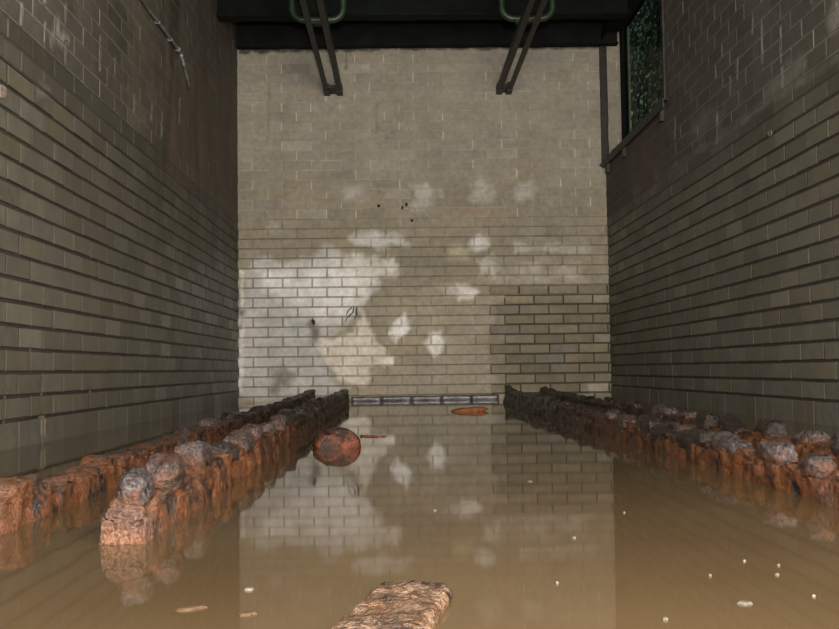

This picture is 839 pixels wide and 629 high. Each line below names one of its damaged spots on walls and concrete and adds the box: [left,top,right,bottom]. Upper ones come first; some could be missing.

water stain [132,0,612,400]